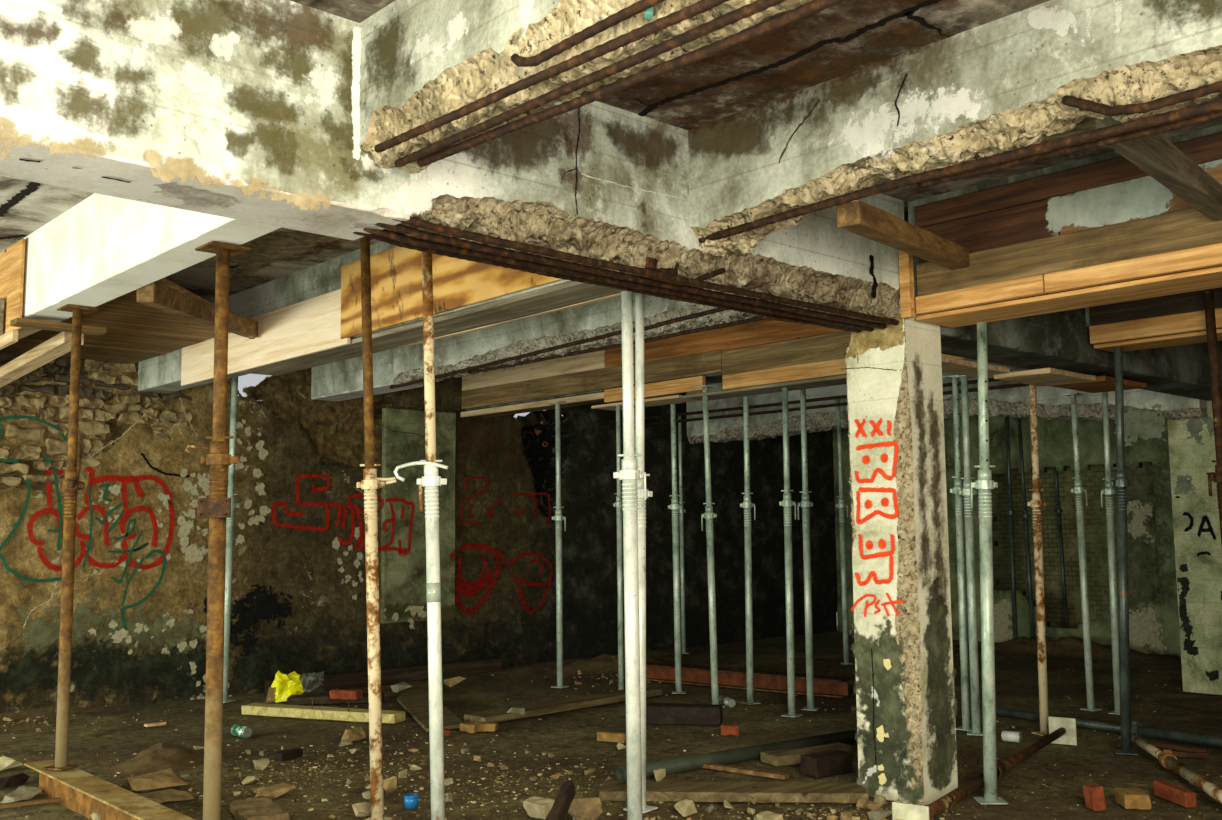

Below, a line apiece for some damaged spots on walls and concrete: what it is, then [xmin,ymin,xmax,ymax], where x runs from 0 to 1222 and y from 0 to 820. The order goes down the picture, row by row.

leakage [0,0,152,135]
leakage [172,0,333,85]
leakage [225,88,300,175]
leakage [322,17,416,182]
spalling [360,0,813,174]
crack [634,0,949,117]
crack [779,99,820,164]
crack [895,73,907,126]
spalling [229,230,327,278]
flaking render [0,357,193,491]
flaking render [231,304,762,468]
spalling [354,45,1222,802]